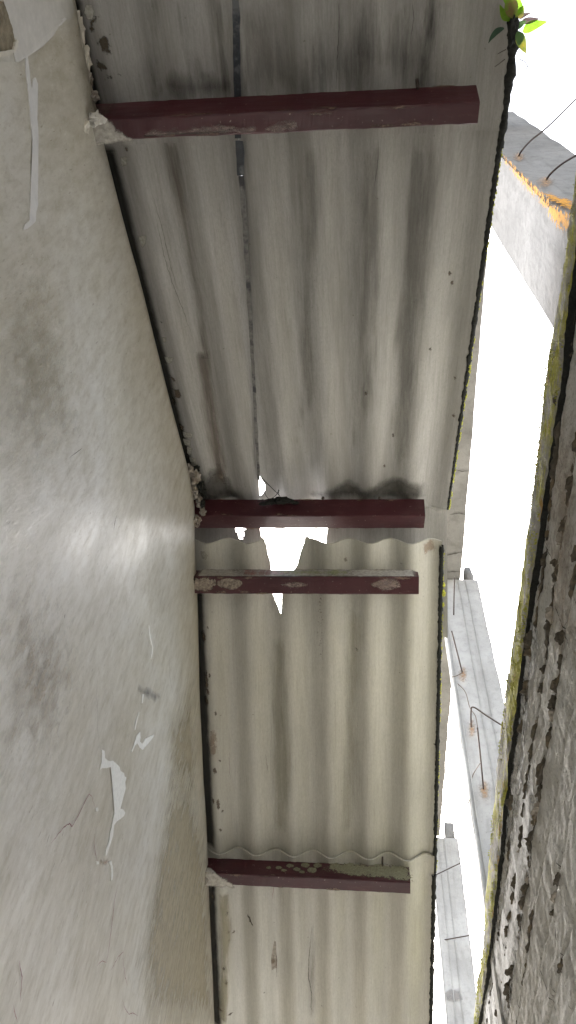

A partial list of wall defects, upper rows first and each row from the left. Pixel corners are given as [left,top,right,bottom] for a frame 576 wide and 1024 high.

peeling [0,0,74,62]
damp [75,0,120,104]
damp [319,479,420,497]
peeling [372,569,410,590]
peeling [96,750,127,881]
damp [482,624,538,1024]